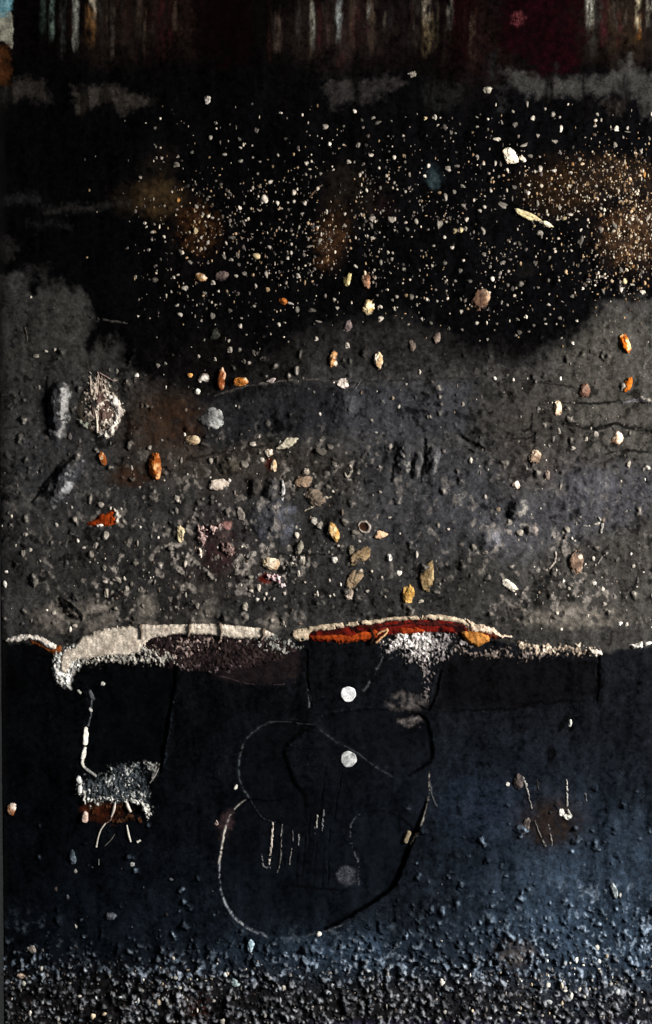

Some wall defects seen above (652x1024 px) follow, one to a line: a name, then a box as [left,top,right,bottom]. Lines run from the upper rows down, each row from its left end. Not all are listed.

crack [389,378,652,468]
peeling [5,614,602,712]